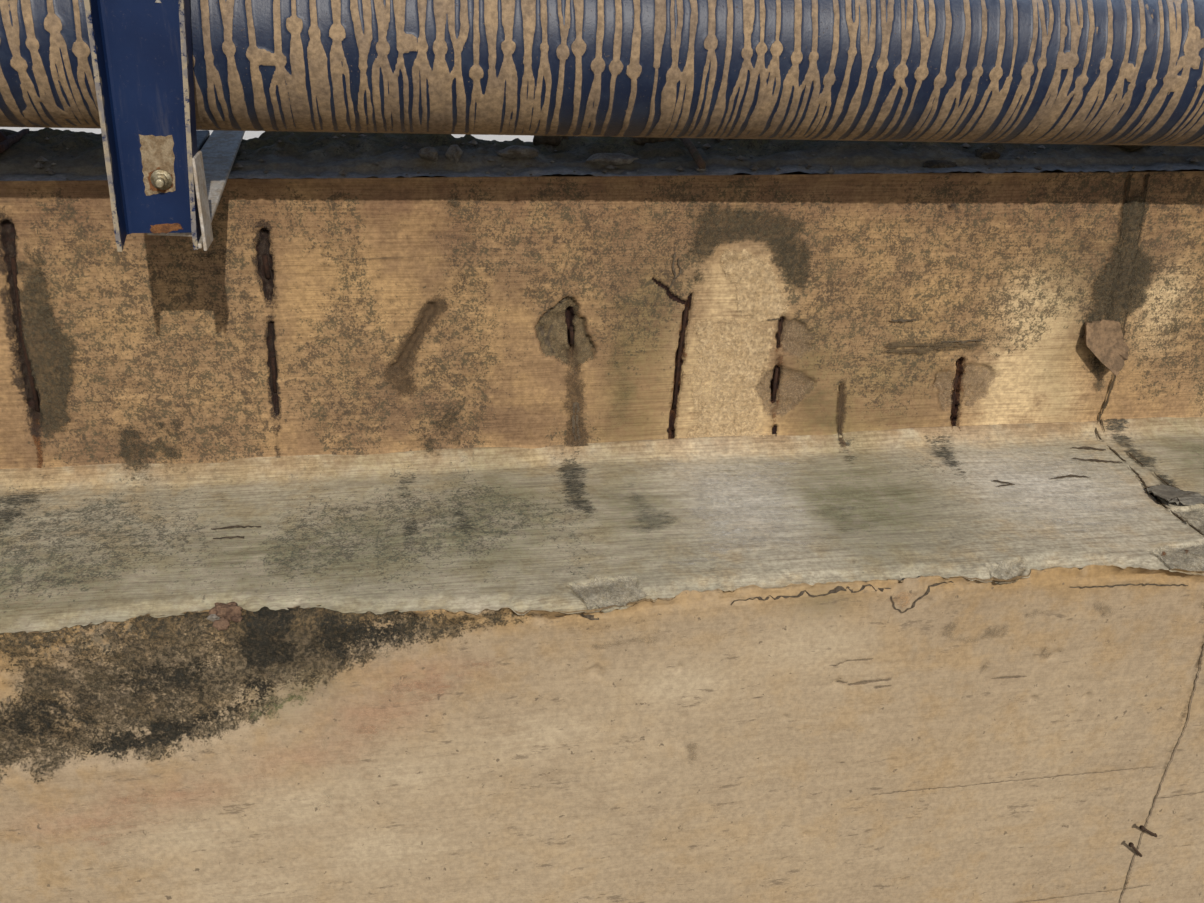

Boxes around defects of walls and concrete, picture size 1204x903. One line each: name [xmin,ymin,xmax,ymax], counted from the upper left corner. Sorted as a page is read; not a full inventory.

crack [652,252,686,304]
water stain [687,198,813,290]
water stain [16,248,77,446]
peeling [1085,319,1129,376]
spalling [1146,484,1204,572]